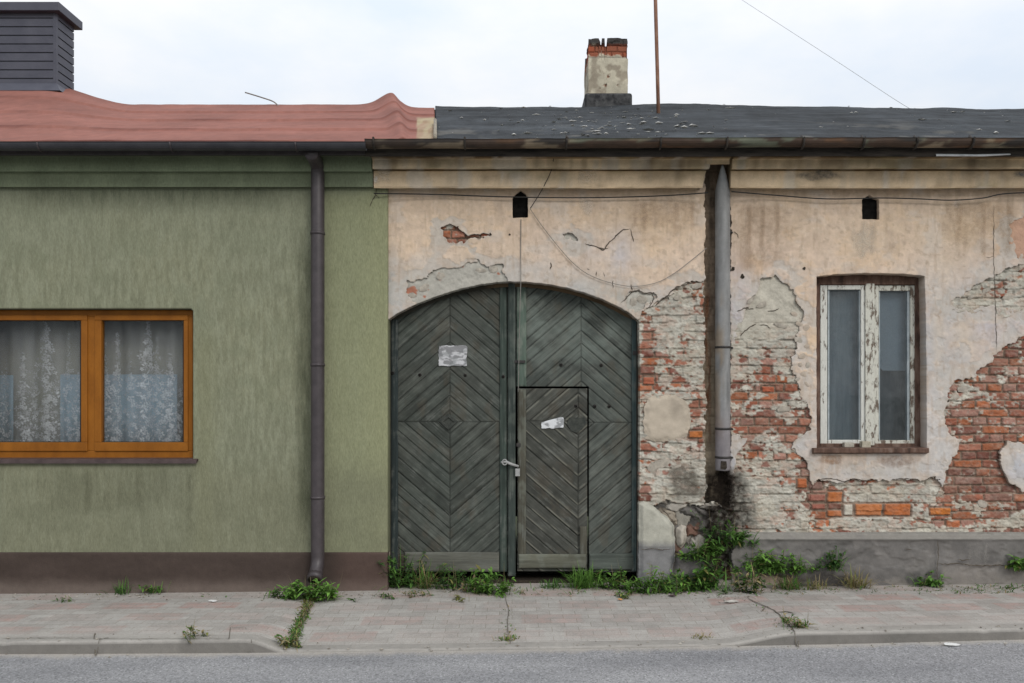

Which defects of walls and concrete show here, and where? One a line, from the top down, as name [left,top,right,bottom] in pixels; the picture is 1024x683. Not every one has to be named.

peeling [406,259,512,307]
flaking render [441,224,492,244]
crack [586,229,694,309]
peeling [951,216,1024,318]
flaking render [624,275,1024,585]
water stain [672,466,751,575]